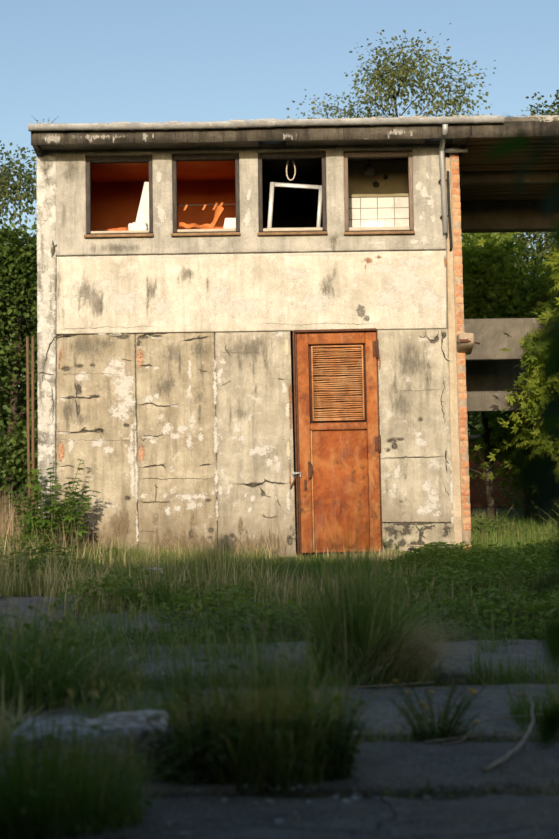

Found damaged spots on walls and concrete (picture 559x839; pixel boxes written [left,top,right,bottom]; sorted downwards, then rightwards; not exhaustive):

peeling [39,185,55,363]
damp [80,285,102,313]
peeling [41,364,114,462]
crack [38,326,259,441]
peeling [98,333,231,542]
crack [242,479,289,518]
peeling [248,441,290,473]
peeling [416,465,454,524]